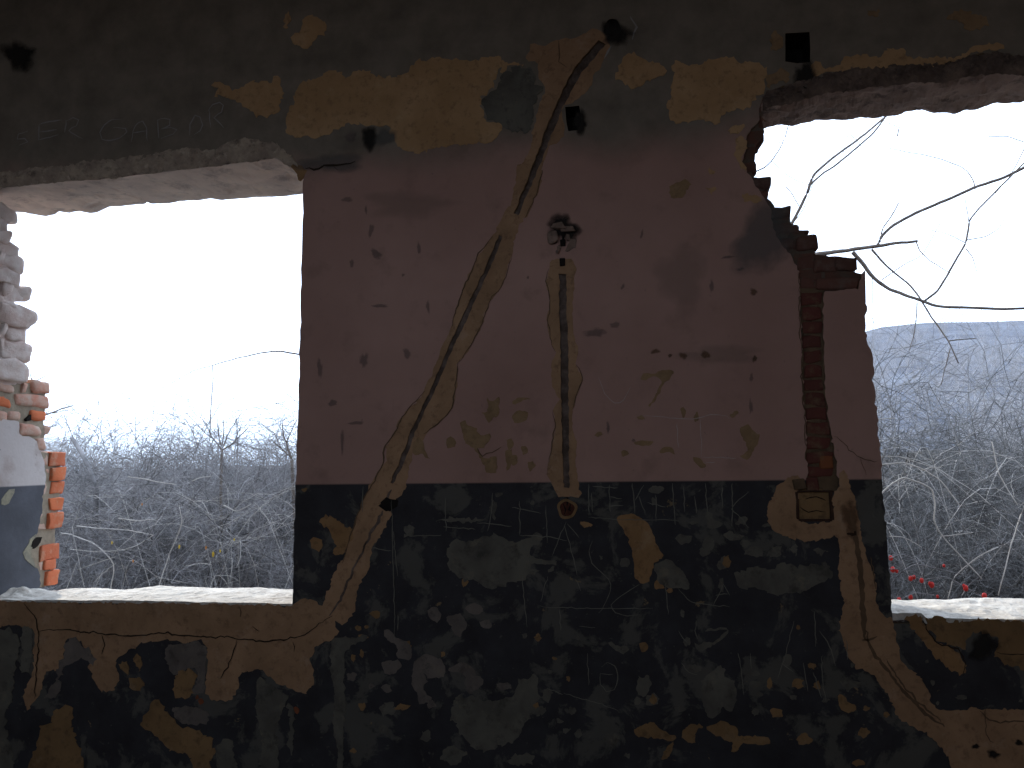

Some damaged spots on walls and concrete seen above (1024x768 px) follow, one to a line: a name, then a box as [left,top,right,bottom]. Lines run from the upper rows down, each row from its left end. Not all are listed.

peeling [211,56,543,154]
flaking render [0,202,66,587]
spalling [615,32,1024,491]
crack [25,605,332,696]
spalling [0,497,392,768]
peeling [617,514,689,593]